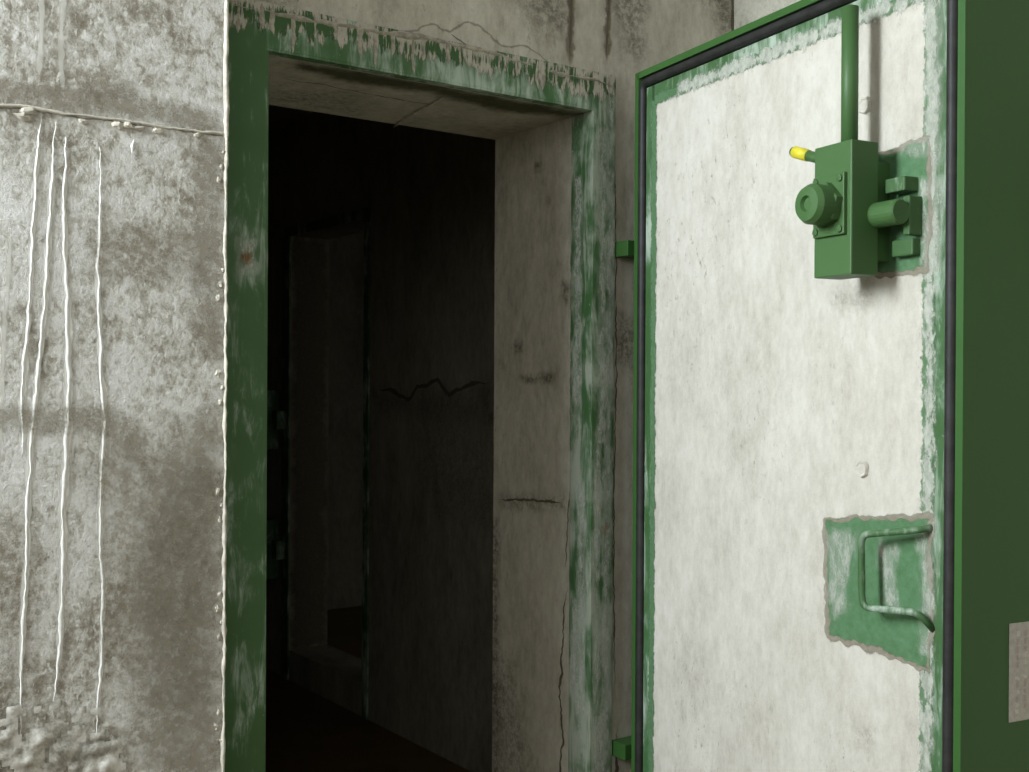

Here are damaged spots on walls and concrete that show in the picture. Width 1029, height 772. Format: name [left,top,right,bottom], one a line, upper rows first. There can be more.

damp [0,79,218,129]
peeling [228,0,616,103]
damp [0,118,225,772]
crack [613,183,631,672]
crack [558,592,567,772]